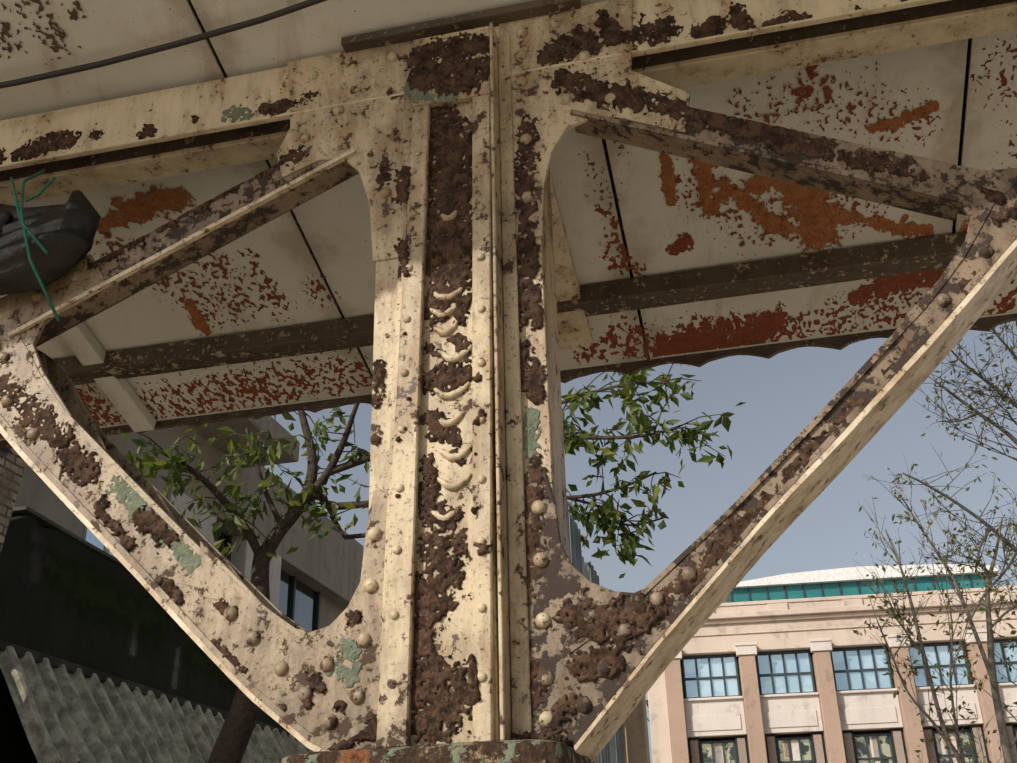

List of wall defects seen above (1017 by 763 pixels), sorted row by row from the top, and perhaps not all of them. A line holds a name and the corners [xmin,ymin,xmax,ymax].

rust [537,1,931,183]
peeling [720,62,943,147]
peeling [971,36,1017,111]
rust [254,145,310,179]
rust [82,182,244,272]
peeling [596,202,647,277]
peeling [658,152,934,258]
peeling [571,268,946,365]
rust [958,269,980,294]
peeling [982,279,1017,315]
rust [881,345,911,376]
peeling [74,384,127,427]